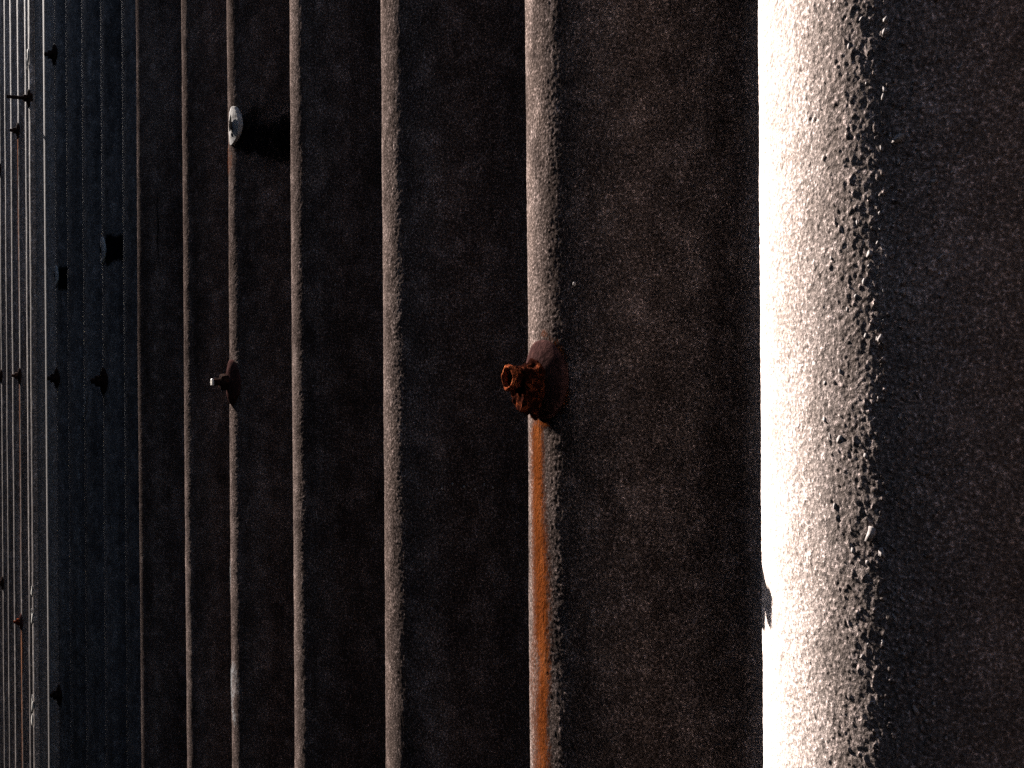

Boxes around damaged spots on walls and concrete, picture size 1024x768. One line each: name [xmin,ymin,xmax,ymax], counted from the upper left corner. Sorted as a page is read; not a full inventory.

corrosion [531,419,551,768]